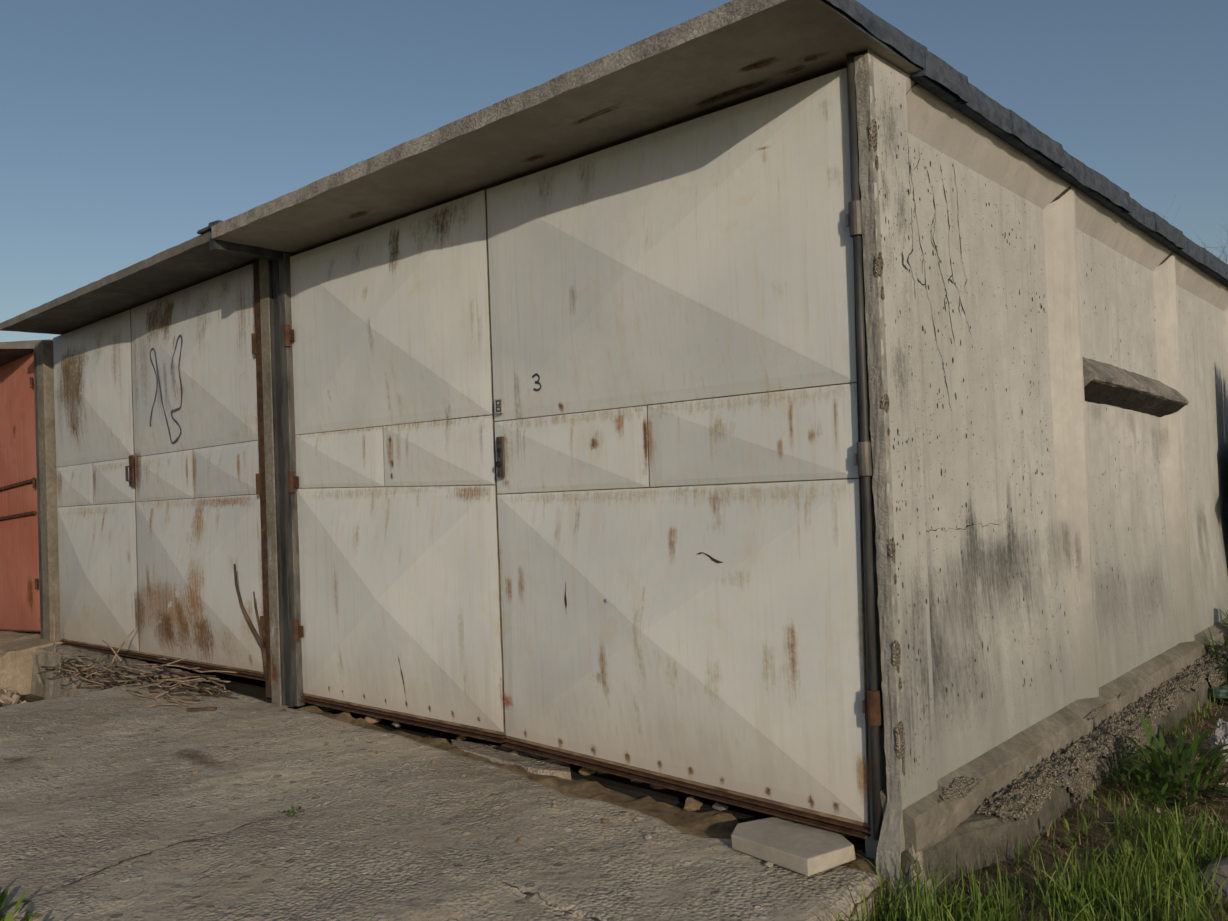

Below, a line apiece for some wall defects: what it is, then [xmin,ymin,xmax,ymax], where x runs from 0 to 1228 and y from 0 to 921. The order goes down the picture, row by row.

crack [902,148,973,403]
rust [134,572,212,654]
spalling [975,644,1228,822]